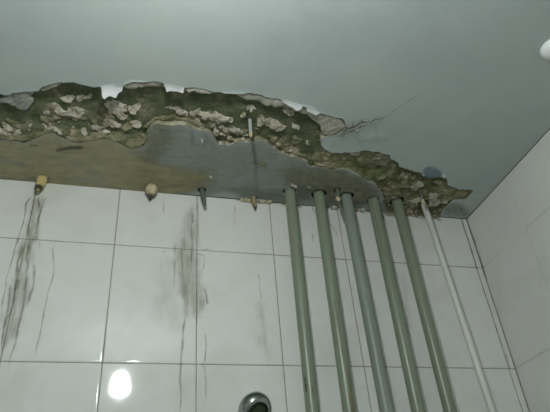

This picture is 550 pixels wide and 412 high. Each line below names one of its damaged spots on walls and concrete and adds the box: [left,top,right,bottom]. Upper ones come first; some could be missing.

spalling [0,81,473,216]
crack [340,110,395,137]